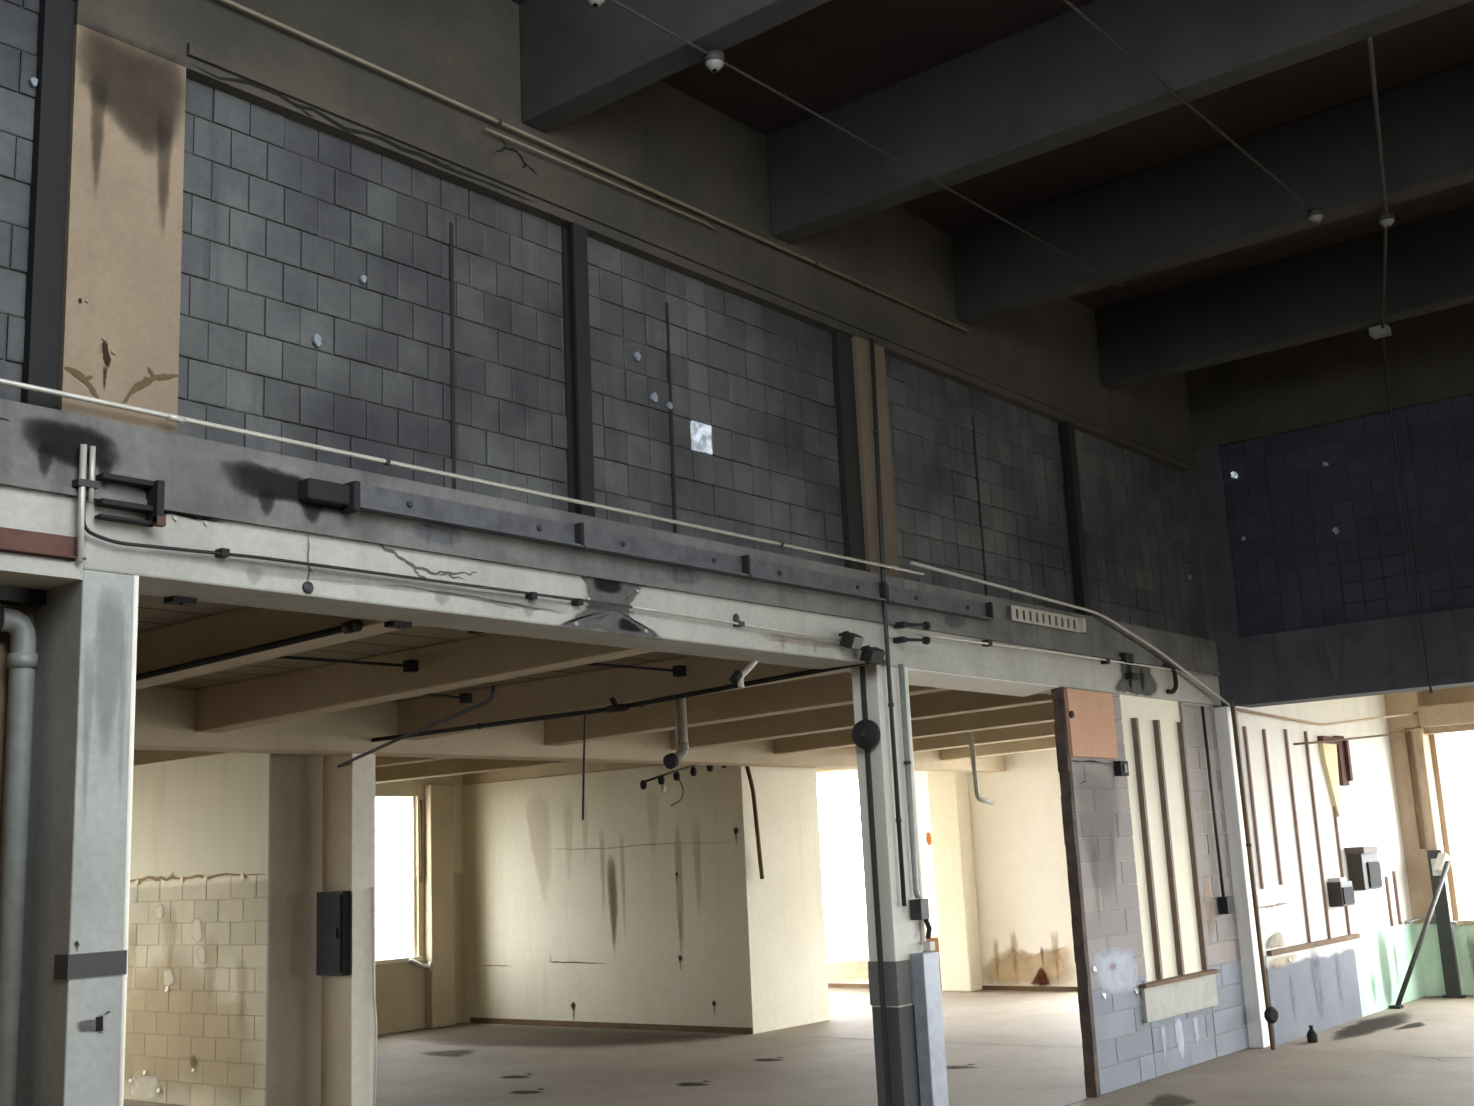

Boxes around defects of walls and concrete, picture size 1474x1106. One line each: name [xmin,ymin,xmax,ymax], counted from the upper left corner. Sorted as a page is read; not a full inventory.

damp [39,448,52,472]
damp [260,493,273,512]
damp [608,867,616,931]